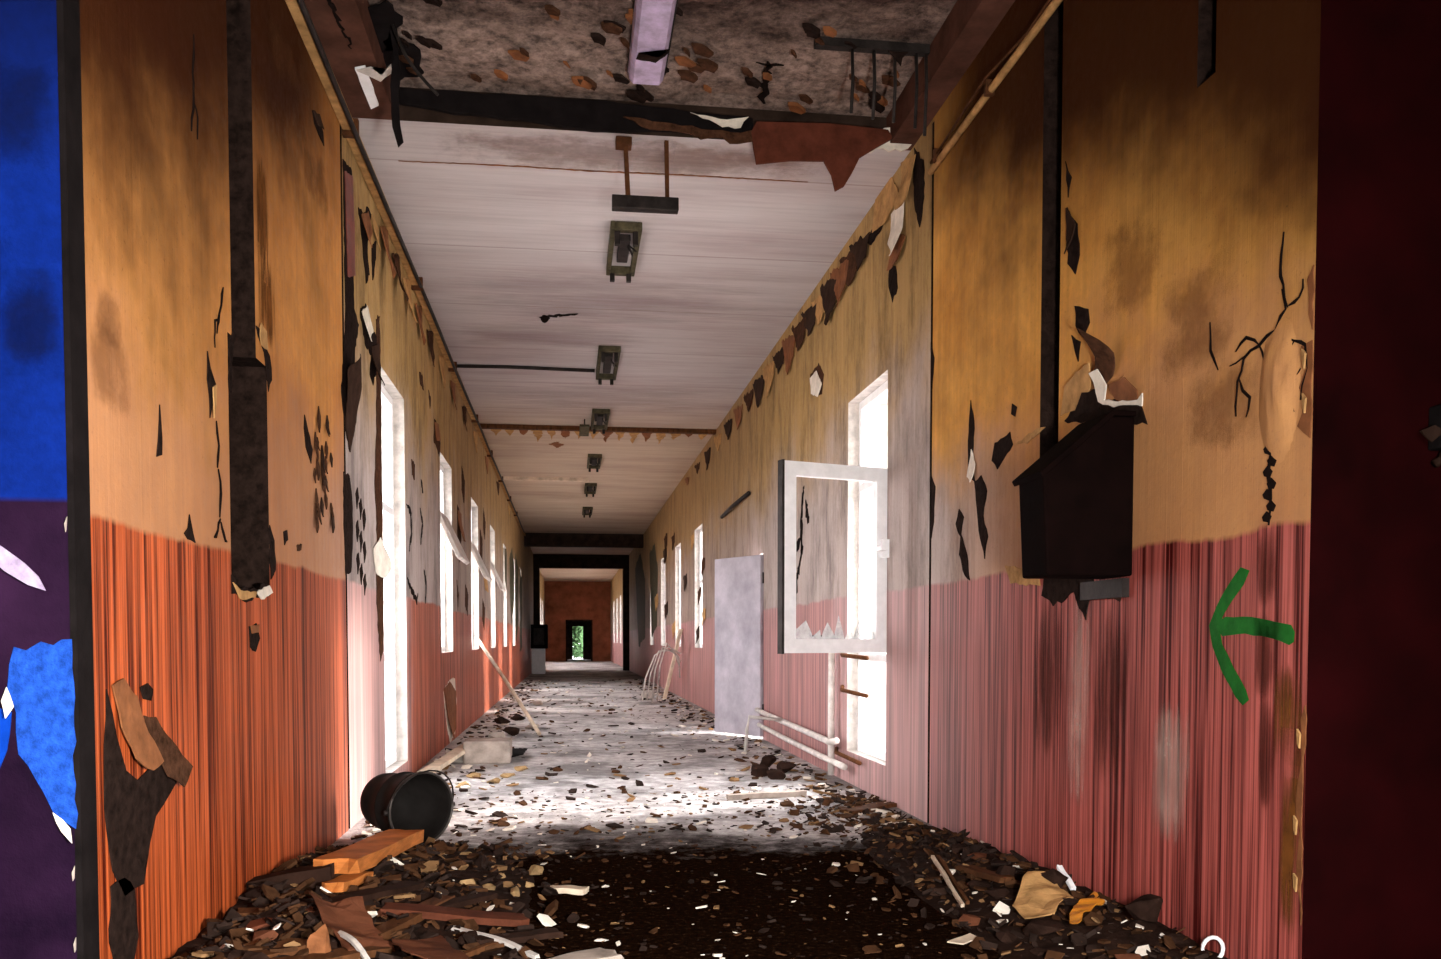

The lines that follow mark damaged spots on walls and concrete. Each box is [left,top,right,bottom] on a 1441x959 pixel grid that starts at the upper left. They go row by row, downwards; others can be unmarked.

flaking render [368,0,442,81]
flaking render [563,61,654,104]
peeling [1064,161,1080,274]
peeling [207,324,235,418]
peeling [304,148,925,661]
crack [1209,232,1308,417]
crack [1262,446,1277,525]
peeling [0,545,46,591]
flaking render [231,525,302,603]
damp [1036,614,1061,743]
peeling [0,639,78,843]
peeling [103,678,193,959]